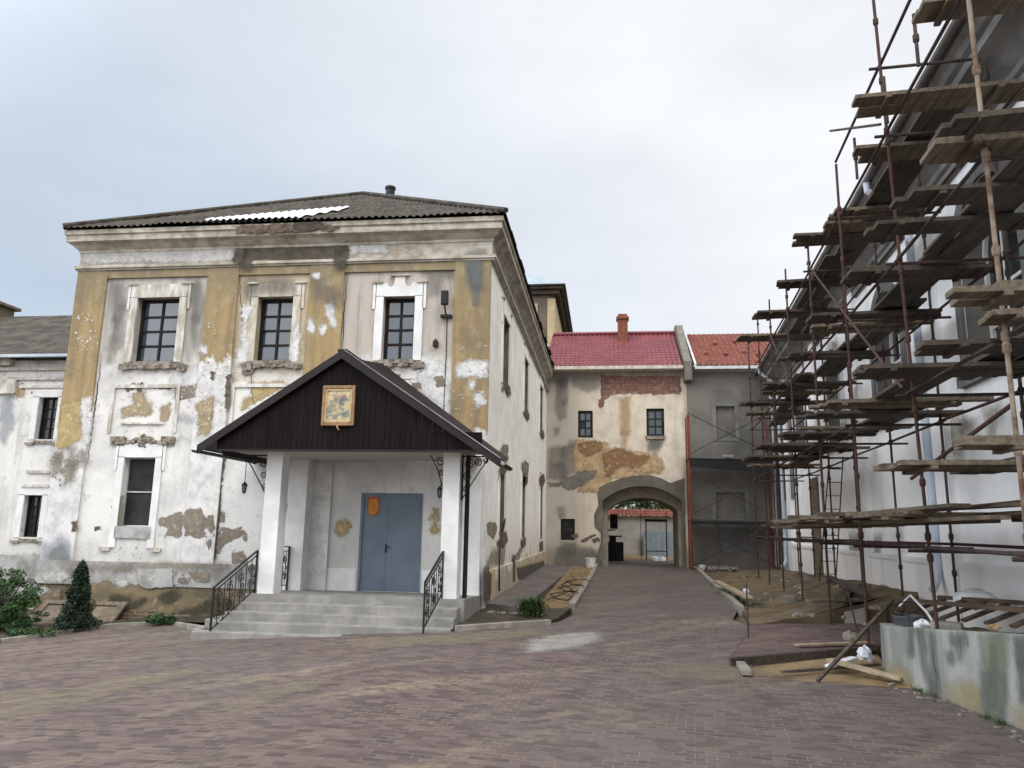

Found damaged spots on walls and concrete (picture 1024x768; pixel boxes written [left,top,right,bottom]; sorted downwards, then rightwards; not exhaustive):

peeling [121,304,285,437]
peeling [412,345,489,416]
flaking render [598,375,682,408]
peeling [50,396,93,486]
flaking render [522,461,562,487]
flaking render [572,439,664,493]
flaking render [26,508,248,623]
flaking render [487,521,526,582]
leakage [109,595,146,611]
leakage [159,590,230,616]
leakage [909,628,940,697]
leakage [1014,637,1024,702]